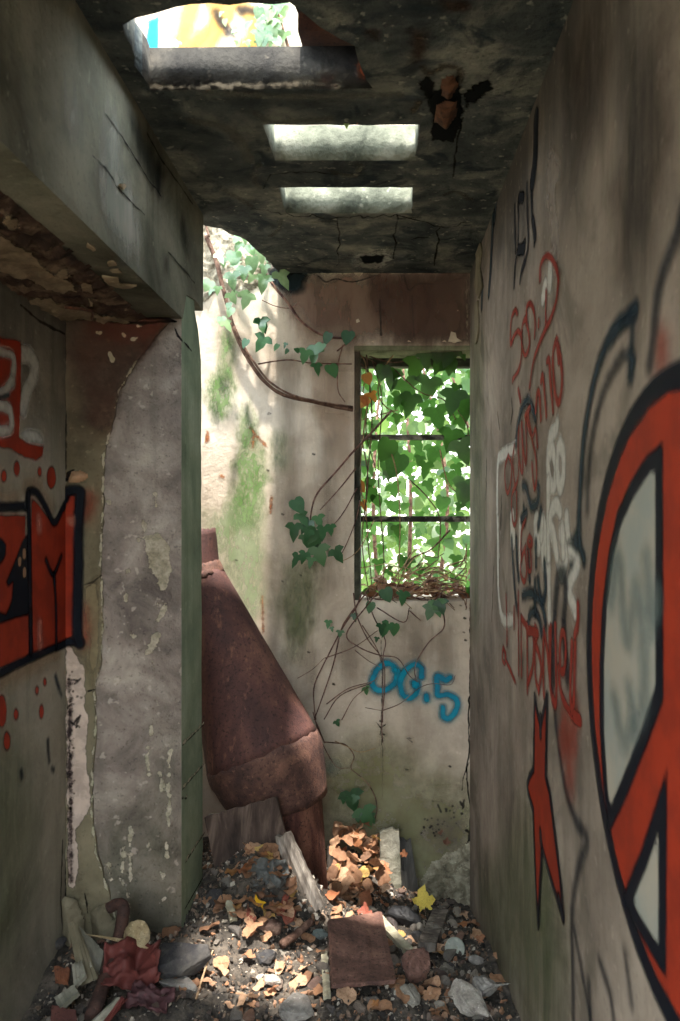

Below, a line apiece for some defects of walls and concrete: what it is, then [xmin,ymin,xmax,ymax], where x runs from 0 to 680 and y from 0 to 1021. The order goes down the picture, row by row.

crack [202,91,403,124]
spalling [410,64,494,142]
crack [93,114,193,215]
crack [187,117,472,266]
water stain [239,411,256,448]
peeling [0,190,174,937]